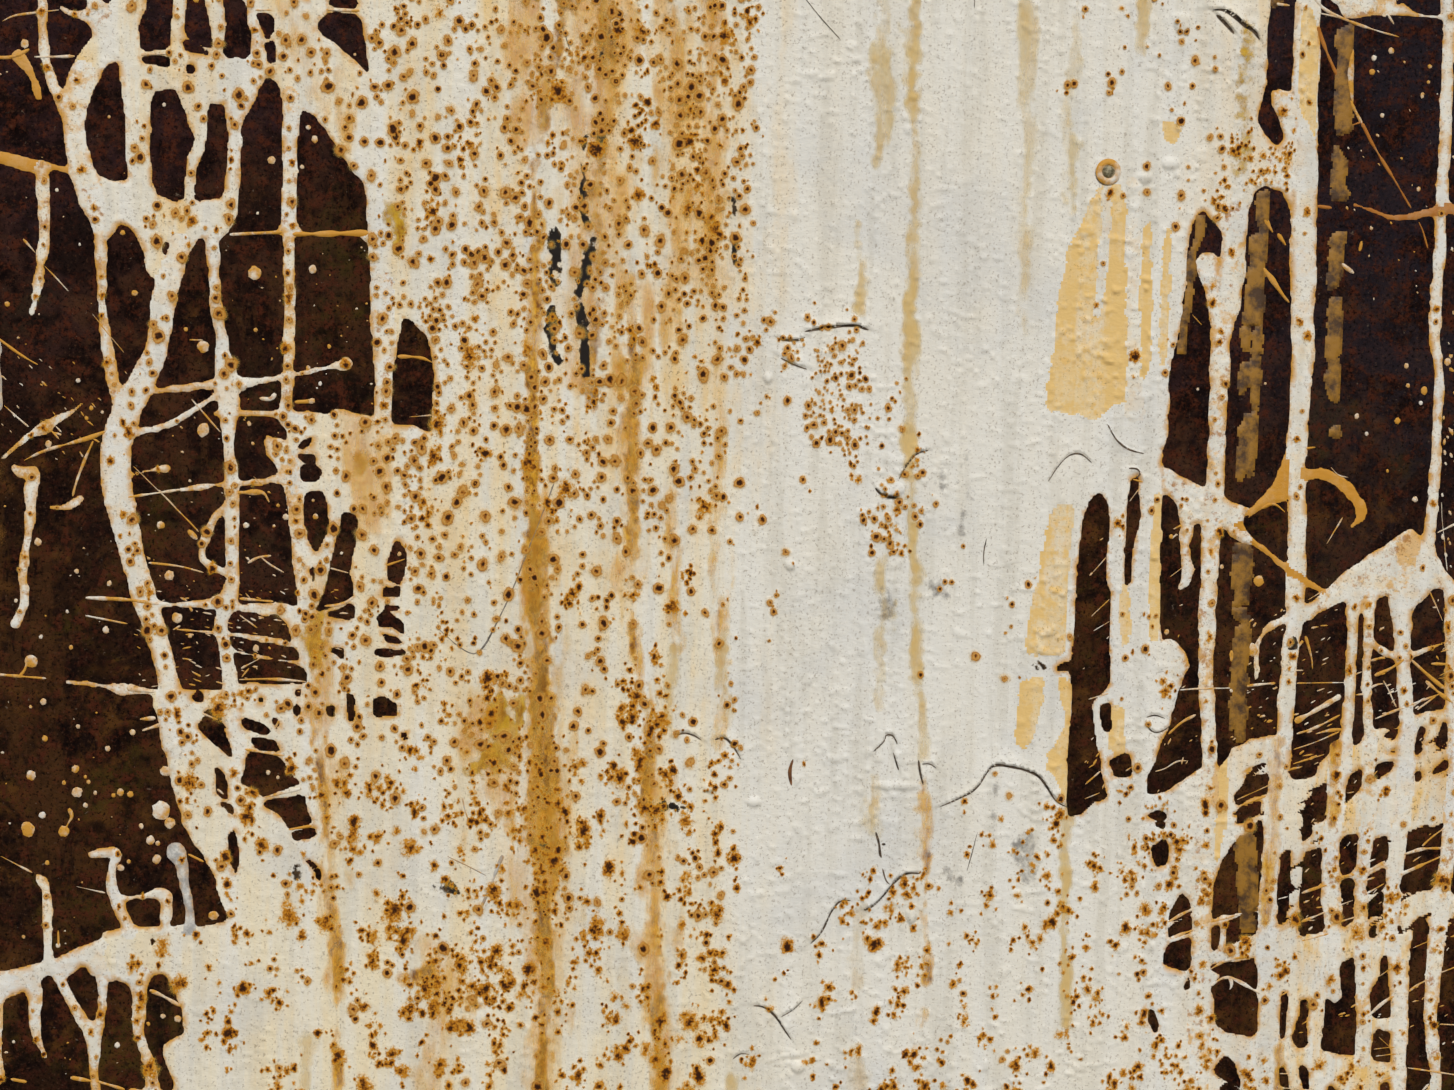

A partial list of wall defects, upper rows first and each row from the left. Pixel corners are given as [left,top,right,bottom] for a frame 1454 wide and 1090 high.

peeling [84,62,128,181]
peeling [150,78,368,241]
corrosion [1165,19,1313,258]
corrosion [103,273,177,466]
corrosion [126,0,939,1090]
peeling [1014,476,1163,817]
crack [874,727,1067,807]
peeling [1210,543,1454,1037]
crack [810,832,920,943]
corrosion [809,763,1228,1090]
corrosion [1222,851,1298,1005]
peeling [1292,916,1454,1090]